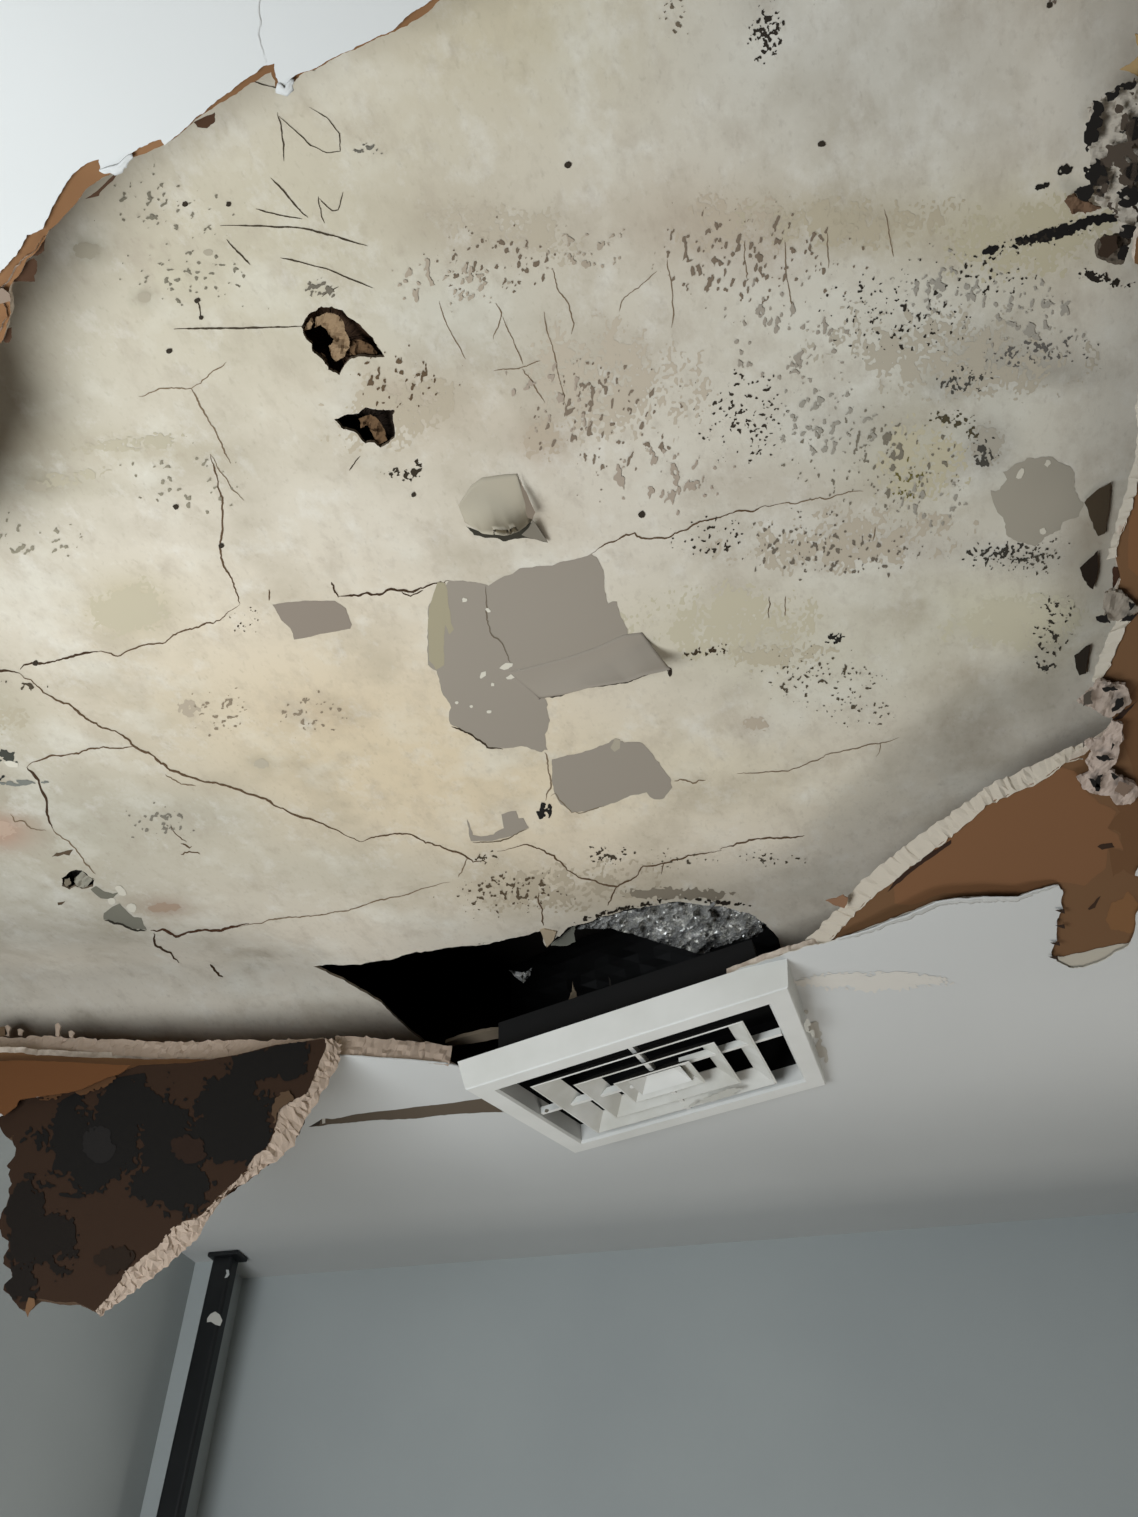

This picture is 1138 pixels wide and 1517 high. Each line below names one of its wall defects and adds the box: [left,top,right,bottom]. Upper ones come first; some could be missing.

mould [747,0,785,64]
damp [113,174,245,320]
flaking render [1064,78,1138,265]
damp [316,345,474,497]
crack [591,491,857,554]
damp [505,164,1135,730]
crack [0,363,803,977]
peeling [427,554,672,812]
crack [677,737,899,784]
spalling [805,742,1083,944]
spalling [0,1035,323,1059]
spalling [398,1002,514,1065]